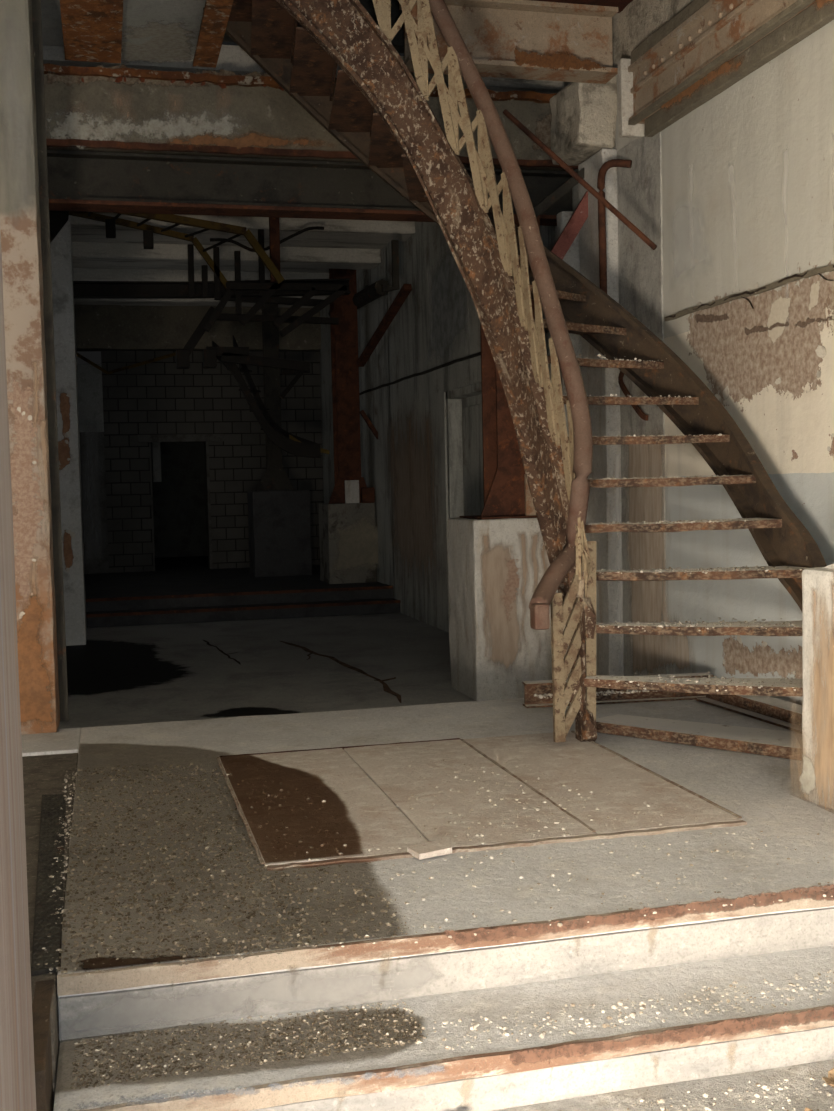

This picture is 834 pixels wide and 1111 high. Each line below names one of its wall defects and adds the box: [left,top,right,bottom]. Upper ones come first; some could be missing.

corrosion [514,45,606,71]
peeling [686,260,834,413]
corrosion [33,362,47,486]
corrosion [17,558,54,725]
crack [280,641,402,703]
water stain [482,534,546,668]
water stain [800,591,834,810]
water stain [219,754,362,863]
corrosion [444,884,834,945]
corrosion [510,1006,834,1065]